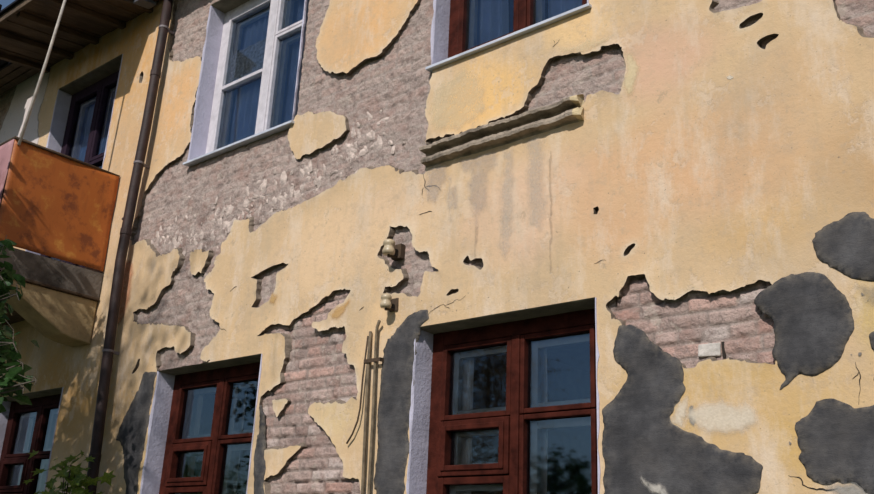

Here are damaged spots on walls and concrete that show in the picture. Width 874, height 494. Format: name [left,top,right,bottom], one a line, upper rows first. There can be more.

flaking render [833,0,874,38]
flaking render [476,44,626,128]
flaking render [130,0,462,371]
flaking render [606,274,776,369]
flaking render [258,289,361,494]
crack [788,475,835,491]